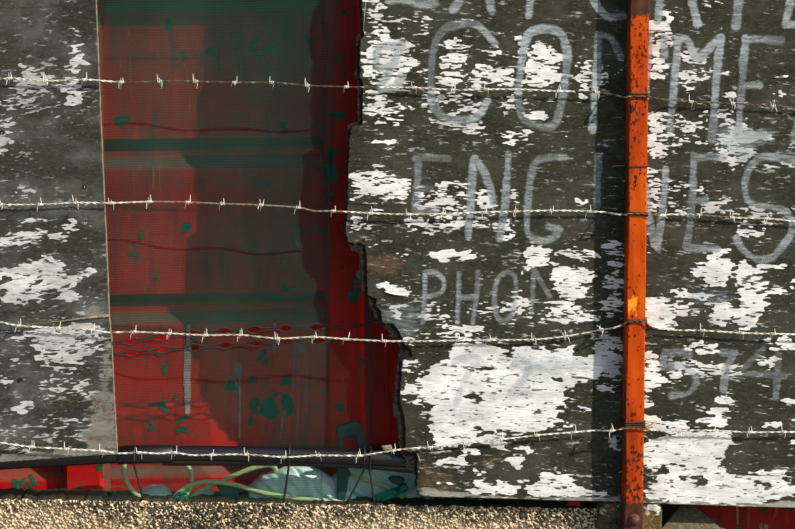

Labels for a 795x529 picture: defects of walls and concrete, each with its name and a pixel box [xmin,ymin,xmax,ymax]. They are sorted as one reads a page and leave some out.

peeling [0,28,90,154]
peeling [333,0,627,146]
peeling [649,11,677,80]
peeling [678,51,729,93]
peeling [0,218,79,247]
peeling [349,164,516,241]
peeling [647,109,795,238]
peeling [0,253,97,306]
peeling [645,248,795,330]
peeling [10,312,110,400]
peeling [376,240,624,500]
peeling [643,335,795,516]